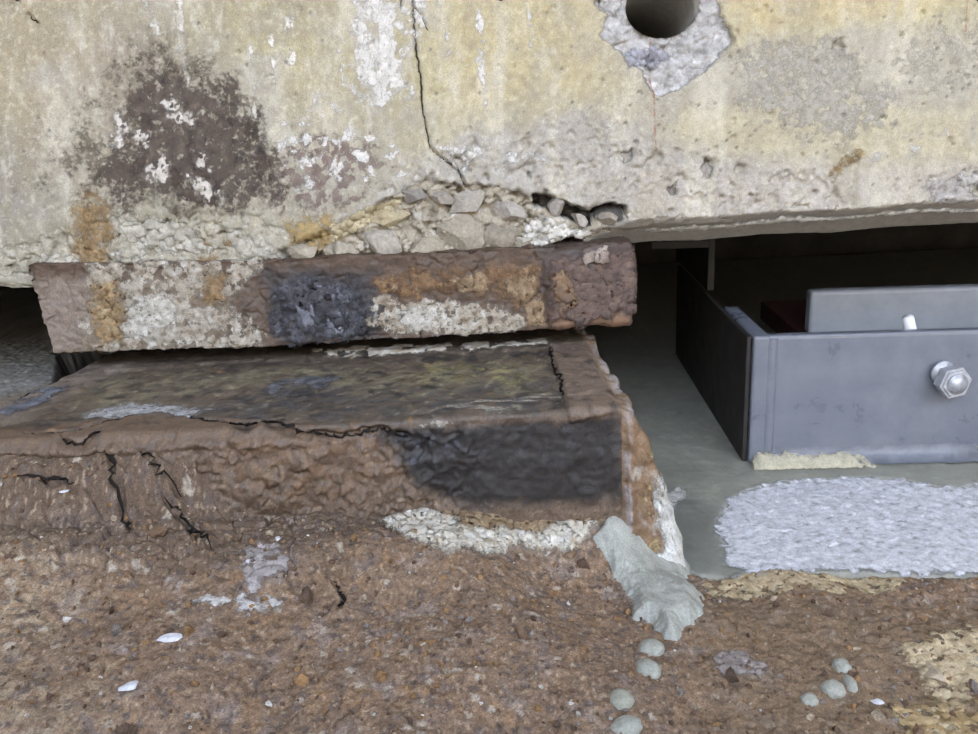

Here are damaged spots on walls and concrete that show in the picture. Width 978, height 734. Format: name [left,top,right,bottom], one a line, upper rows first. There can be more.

leakage [53,0,406,216]
crack [400,0,466,187]
spalling [595,0,731,97]
peeling [736,34,900,145]
corrosion [65,190,119,263]
spalling [0,179,624,276]
corrosion [87,279,126,347]
corrosion [311,338,549,357]
corrosion [373,265,550,326]
crack [32,414,134,533]
crack [140,451,213,551]
crack [189,416,406,439]